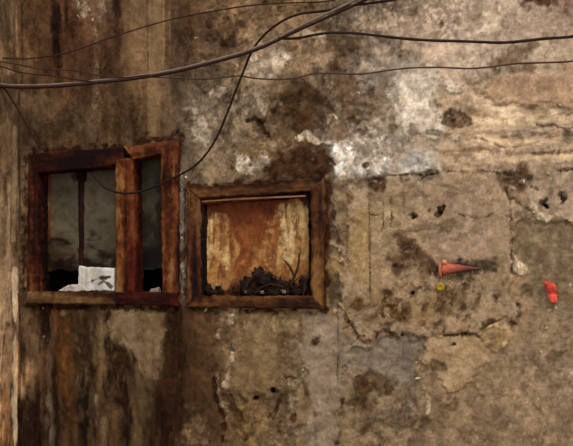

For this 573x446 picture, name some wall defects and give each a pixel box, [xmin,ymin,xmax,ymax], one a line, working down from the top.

leakage [52,2,68,74]
leakage [271,79,335,131]
corrosion [134,129,185,151]
corrosion [182,141,337,250]
corrosion [207,198,309,296]
leakage [39,303,51,339]
crack [336,306,403,345]
crack [438,321,496,338]
leakage [108,342,134,410]
leakage [155,306,186,446]
peeling [341,323,511,414]
leakage [17,394,40,446]